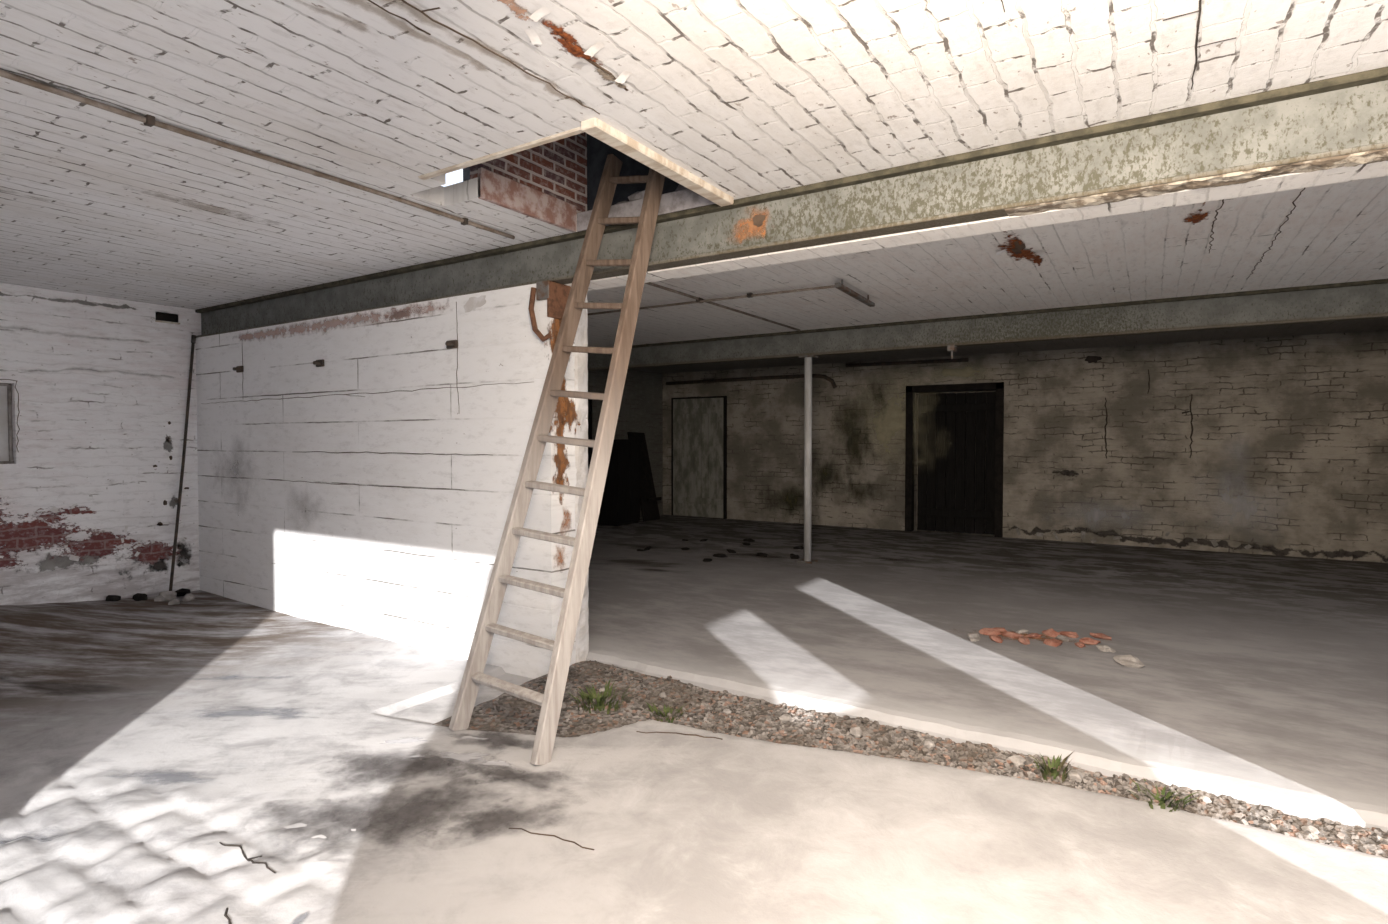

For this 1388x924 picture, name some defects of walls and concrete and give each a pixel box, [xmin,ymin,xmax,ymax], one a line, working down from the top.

crack [1163,0,1236,90]
rust [736,210,768,243]
rust [544,318,562,353]
rust [549,377,581,564]
peeling [0,496,182,569]
crack [219,842,276,873]
crack [224,908,232,924]